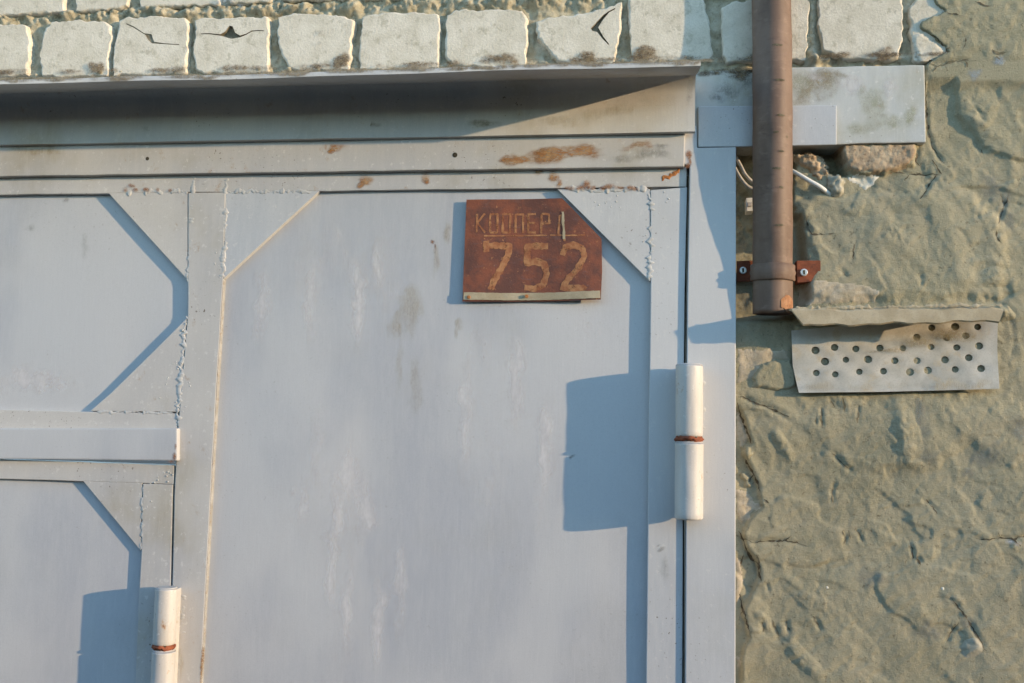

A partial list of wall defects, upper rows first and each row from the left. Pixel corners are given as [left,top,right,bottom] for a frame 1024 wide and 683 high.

crack [126,23,263,45]
crack [591,8,615,45]
crack [891,94,943,199]
corrosion [501,145,636,190]
spalling [793,152,828,180]
crack [737,396,789,503]
crack [738,531,805,579]
crack [976,532,1024,547]
crack [739,594,750,631]